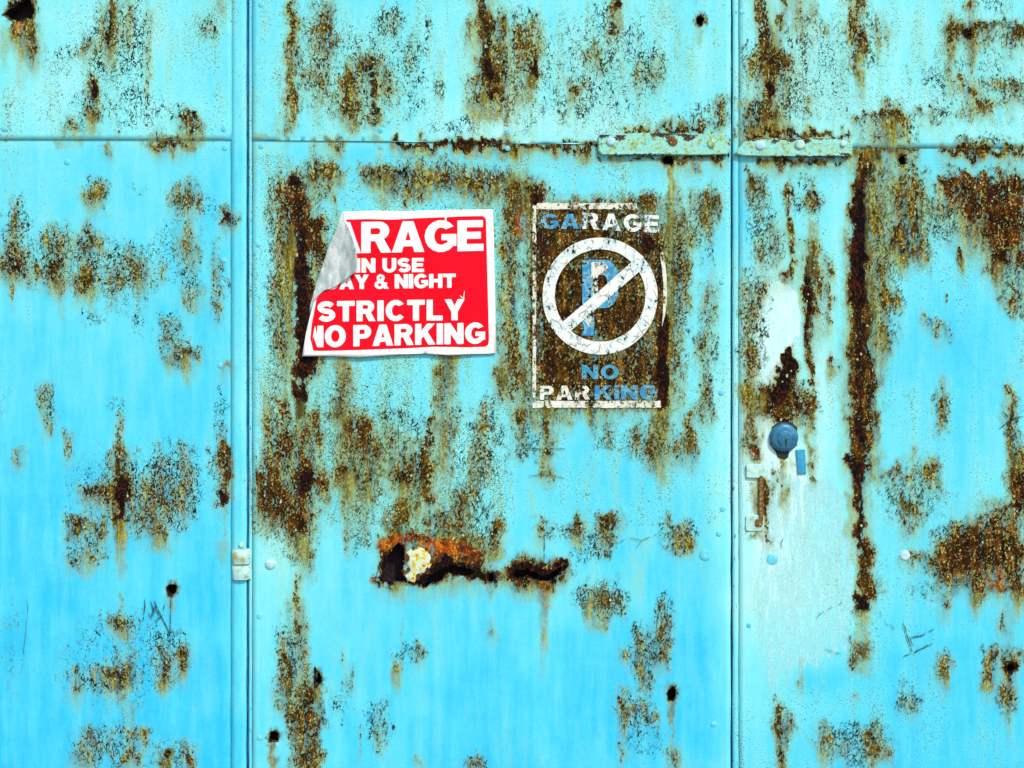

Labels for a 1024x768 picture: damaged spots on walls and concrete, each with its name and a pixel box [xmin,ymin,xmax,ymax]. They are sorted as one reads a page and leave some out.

rust [0,176,242,374]
rust [44,0,730,768]
rust [623,0,1024,693]
spalling [380,535,565,589]
rust [809,678,925,768]